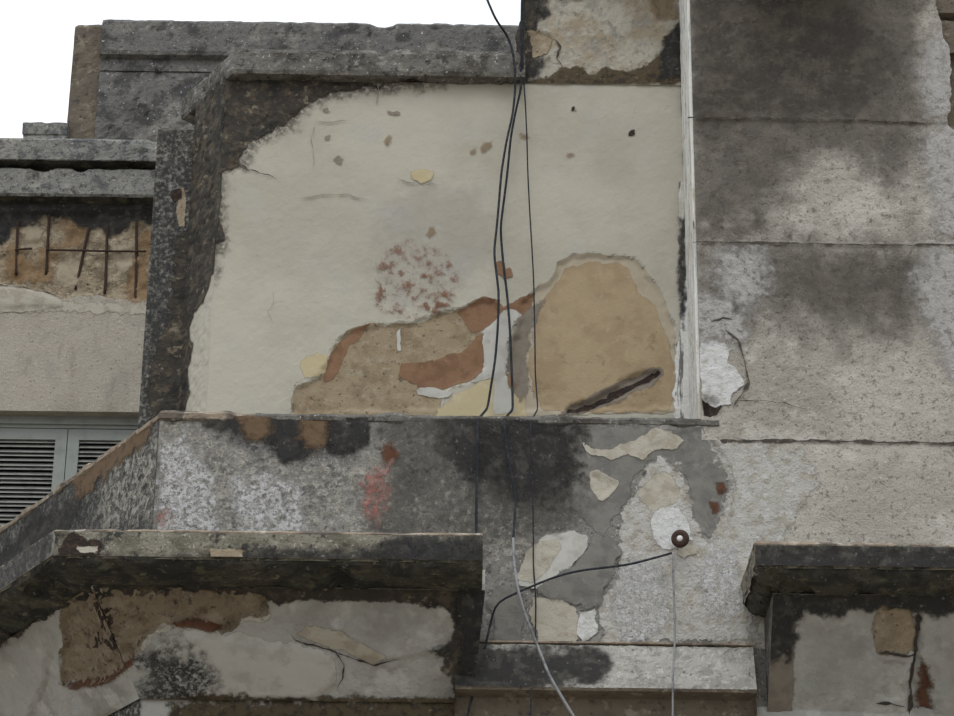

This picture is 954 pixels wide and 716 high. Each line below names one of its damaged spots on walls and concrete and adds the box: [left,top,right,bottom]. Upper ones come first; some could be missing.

spalling [0,214,152,302]
leakage [0,76,424,589]
peeling [291,181,749,419]
crack [711,317,804,409]
leakage [706,20,954,382]
leakage [172,418,590,560]
peeling [94,421,819,648]
crack [720,438,954,446]
spalling [58,586,271,690]
crack [292,623,398,689]
leakage [110,585,613,716]
spalling [871,606,916,656]